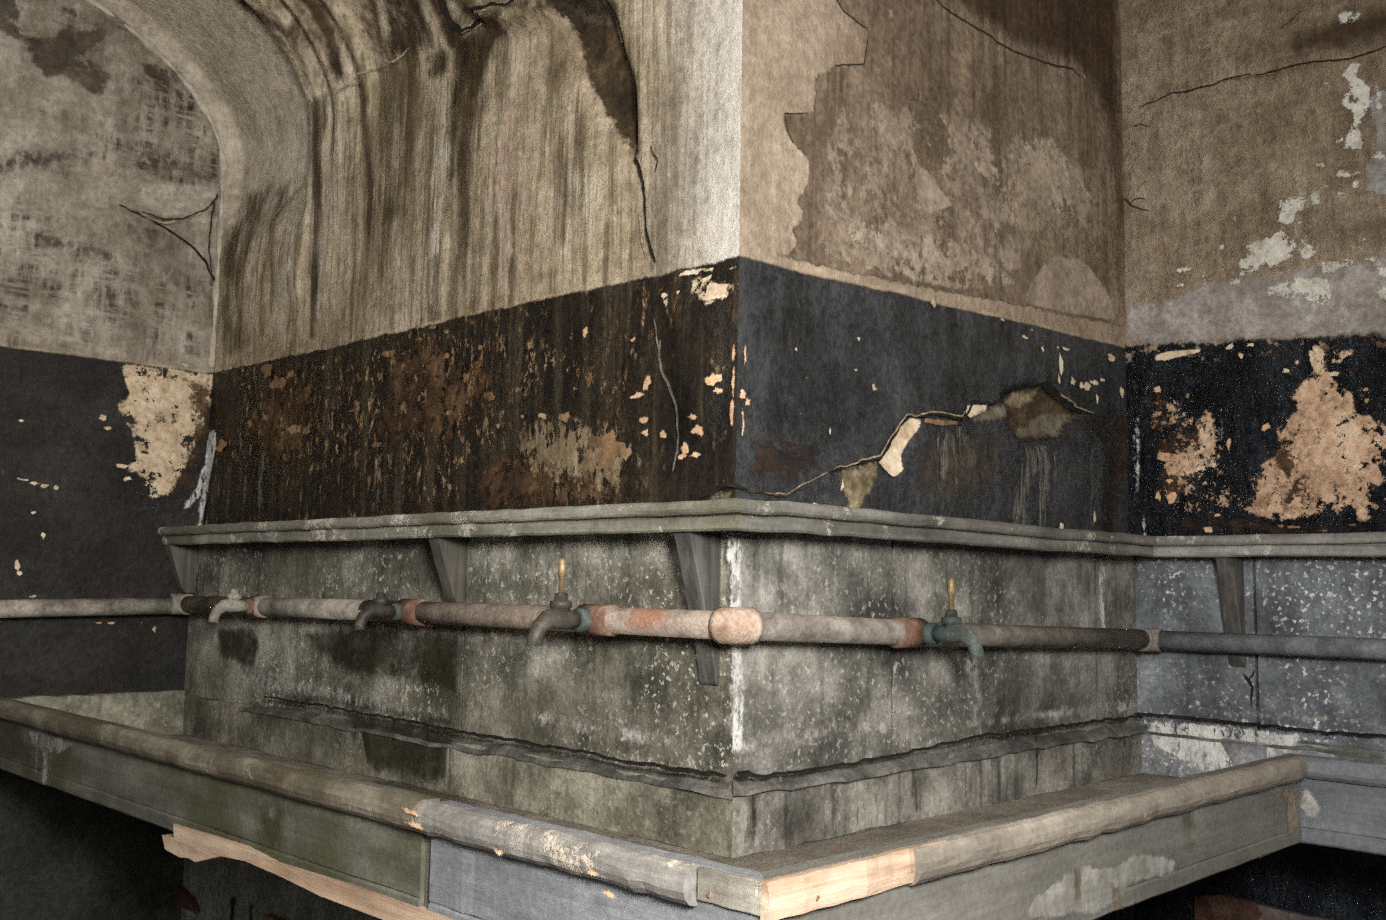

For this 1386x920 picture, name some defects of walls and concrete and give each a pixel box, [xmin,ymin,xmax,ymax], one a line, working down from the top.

crack [438,0,513,36]
crack [120,194,218,281]
leakage [222,0,527,351]
crack [634,146,658,263]
peeling [778,0,1386,532]
peeling [99,363,227,503]
peeling [241,266,736,510]
peeling [705,346,750,435]
crack [700,383,1094,500]
leakage [726,536,750,607]
leakage [219,627,476,805]
leakage [730,644,754,754]